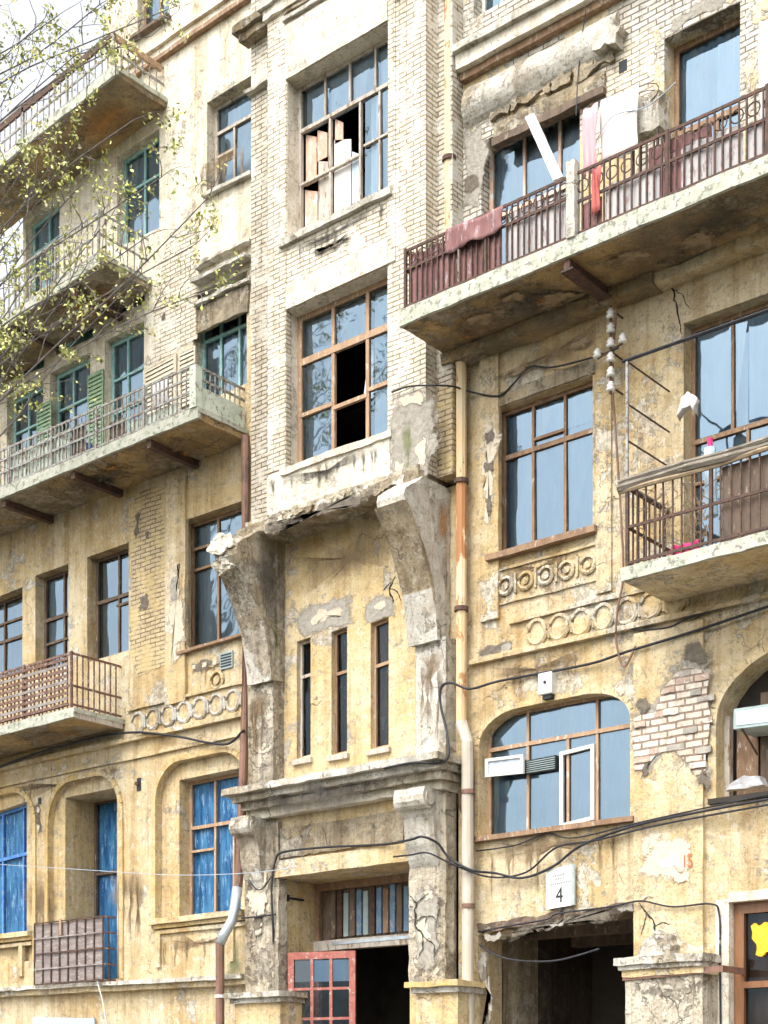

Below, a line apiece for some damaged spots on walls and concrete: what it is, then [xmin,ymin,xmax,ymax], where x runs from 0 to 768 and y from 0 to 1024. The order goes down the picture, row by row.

crack [671,288,690,338]
peeling [480,414,502,524]
peeling [295,595,353,636]
peeling [365,594,395,623]
flaking render [630,642,716,790]
crack [409,893,436,960]